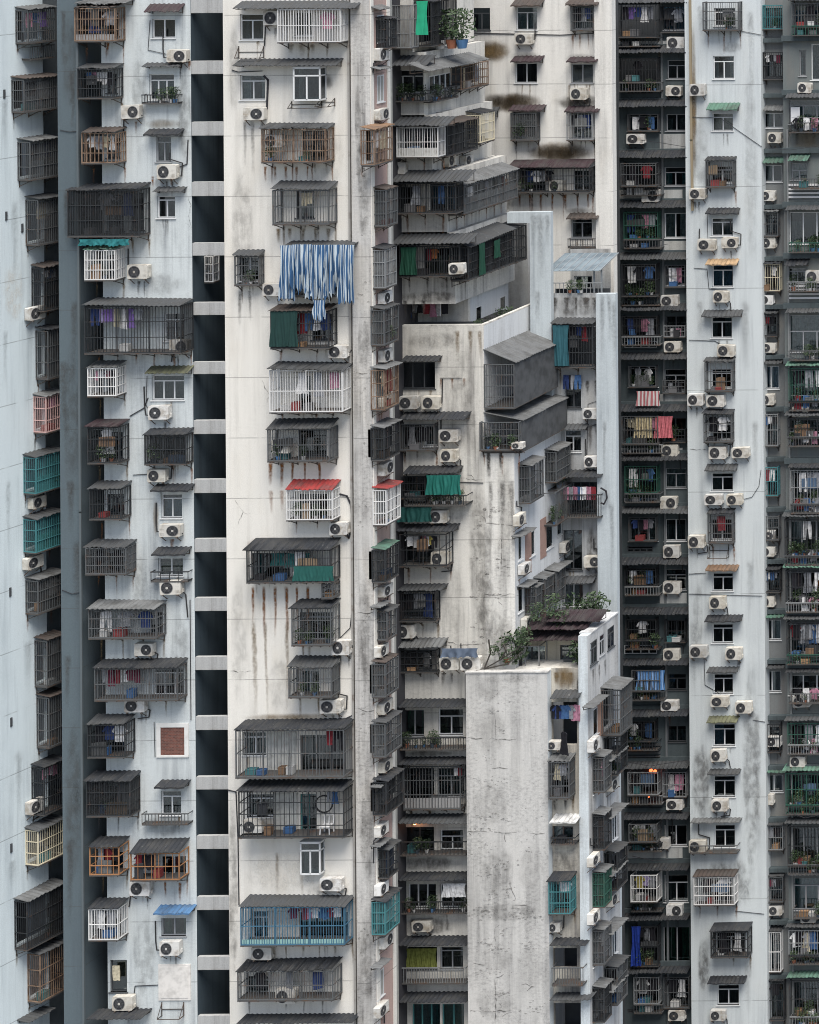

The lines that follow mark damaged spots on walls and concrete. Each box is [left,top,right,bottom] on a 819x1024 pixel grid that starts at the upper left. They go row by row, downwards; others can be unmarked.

water stain [485,45,505,58]
rust [269,463,321,479]
rust [252,588,309,624]